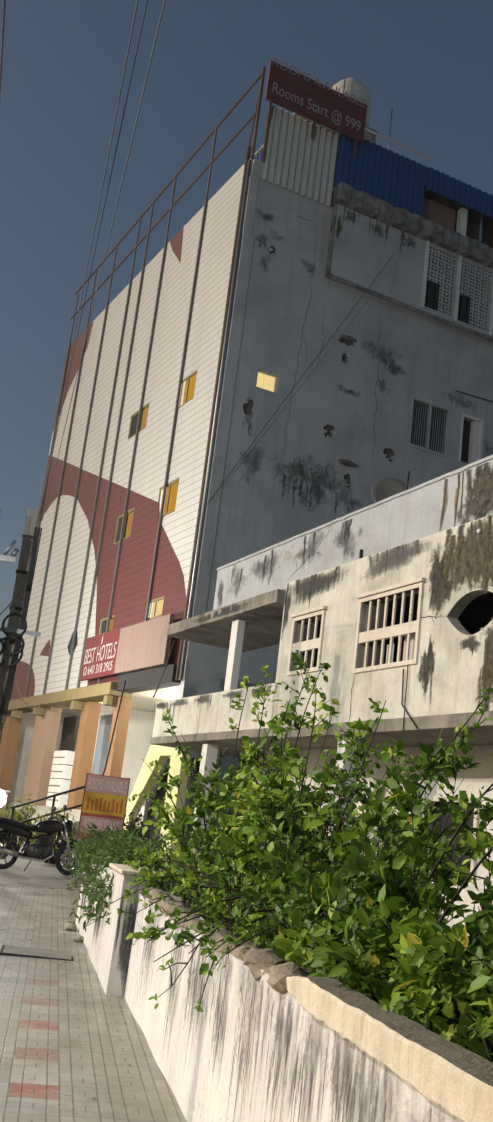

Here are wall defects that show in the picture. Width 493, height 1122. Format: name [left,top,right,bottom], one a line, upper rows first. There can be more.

damp [336,209,414,252]
spalling [243,396,253,415]
spalling [322,422,336,440]
spalling [383,446,396,462]
damp [281,462,355,638]
damp [367,448,493,615]
damp [418,637,435,699]
damp [460,622,493,711]
damp [115,895,155,1002]
damp [163,927,387,1122]